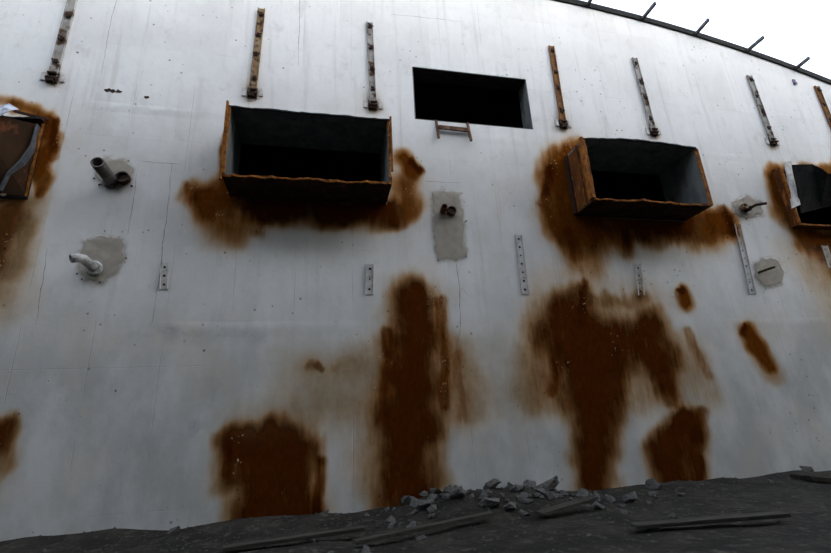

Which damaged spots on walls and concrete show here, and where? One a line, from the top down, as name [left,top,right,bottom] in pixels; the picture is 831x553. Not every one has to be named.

corrosion [8,99,62,197]
corrosion [0,199,33,279]
corrosion [191,151,424,234]
corrosion [540,139,739,256]
corrosion [767,166,831,253]
corrosion [677,285,692,309]
corrosion [0,416,17,454]
corrosion [216,415,324,520]
corrosion [374,277,452,508]
corrosion [532,282,682,491]
corrosion [644,405,707,483]
corrosion [741,324,776,372]